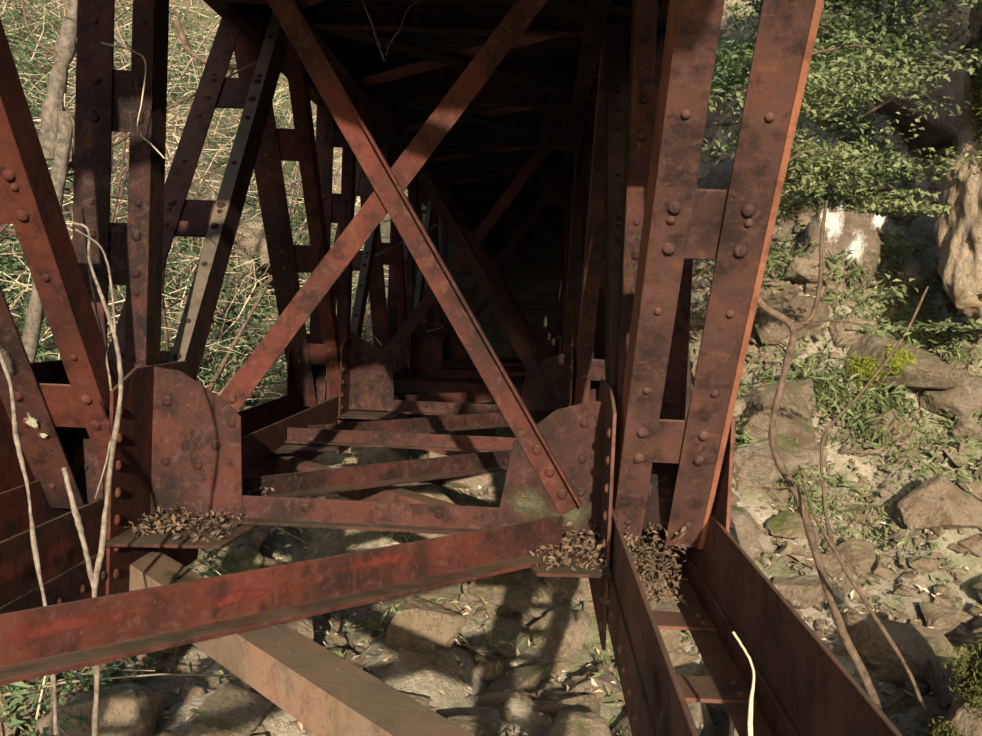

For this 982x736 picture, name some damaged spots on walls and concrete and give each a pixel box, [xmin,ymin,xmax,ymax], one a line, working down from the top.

corrosion [0,562,89,614]